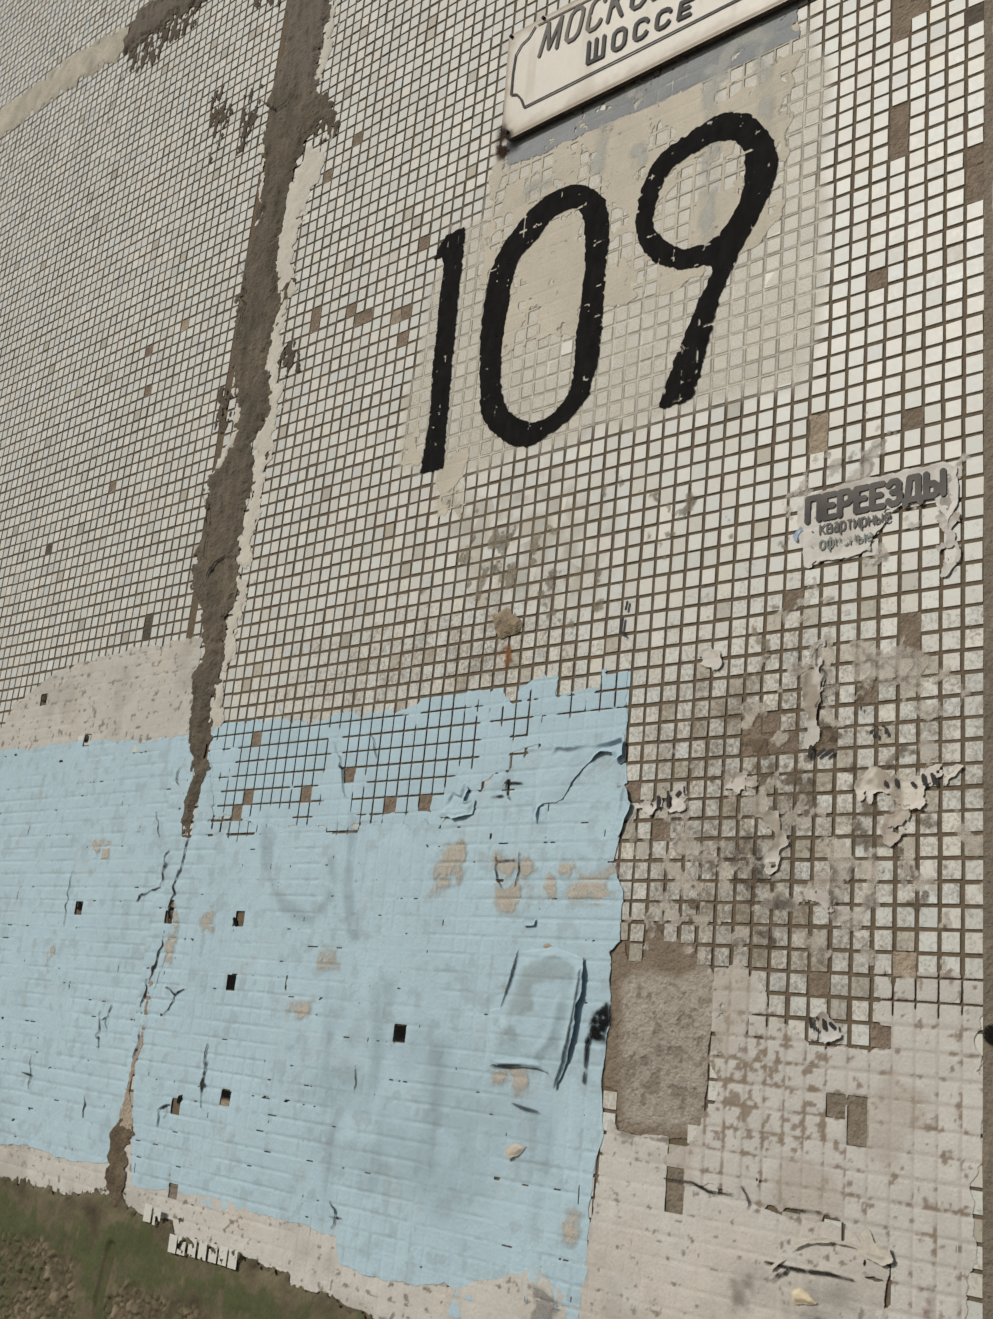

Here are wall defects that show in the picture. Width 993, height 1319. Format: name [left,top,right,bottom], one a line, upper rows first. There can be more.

crack [74,0,340,1210]
spalling [899,612,922,658]
spalling [742,711,799,757]
peeling [419,784,475,819]
peeling [532,737,623,820]
peeling [612,781,641,836]
spalling [652,820,670,841]
peeling [433,840,466,892]
peeling [493,852,615,913]
spalling [604,924,717,1139]
spalling [168,1183,178,1200]
peeling [531,1288,555,1319]